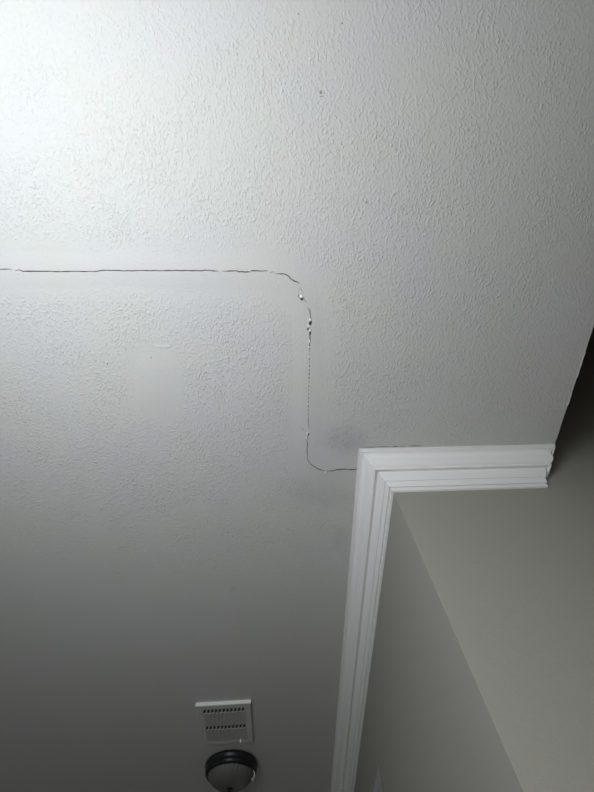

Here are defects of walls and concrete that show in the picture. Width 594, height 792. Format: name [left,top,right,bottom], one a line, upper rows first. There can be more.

crack [1,269,355,473]